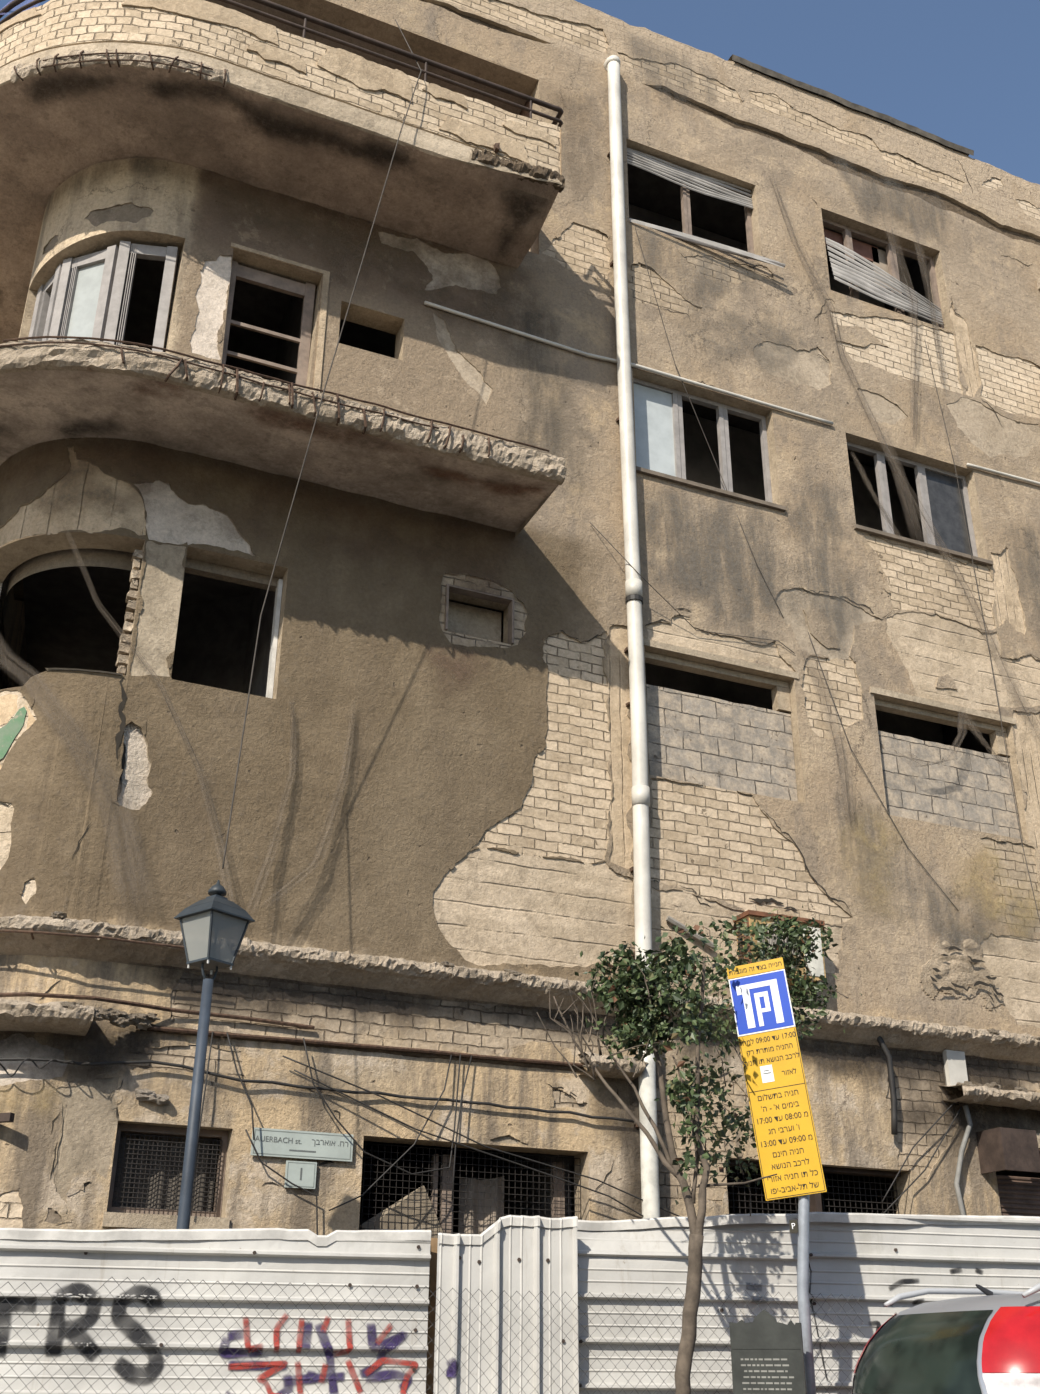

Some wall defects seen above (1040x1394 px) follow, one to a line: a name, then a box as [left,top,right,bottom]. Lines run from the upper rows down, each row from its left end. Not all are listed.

damp [31,78,112,102]
damp [152,83,408,165]
spalling [0,250,567,485]
flaking render [753,299,1040,458]
flaking render [0,443,259,677]
crack [790,587,893,618]
crack [115,677,127,801]
flaking render [111,716,152,810]
flaking render [0,801,14,869]
spalling [0,878,185,952]
flaking render [236,535,1040,1179]
flaking render [0,973,748,1228]